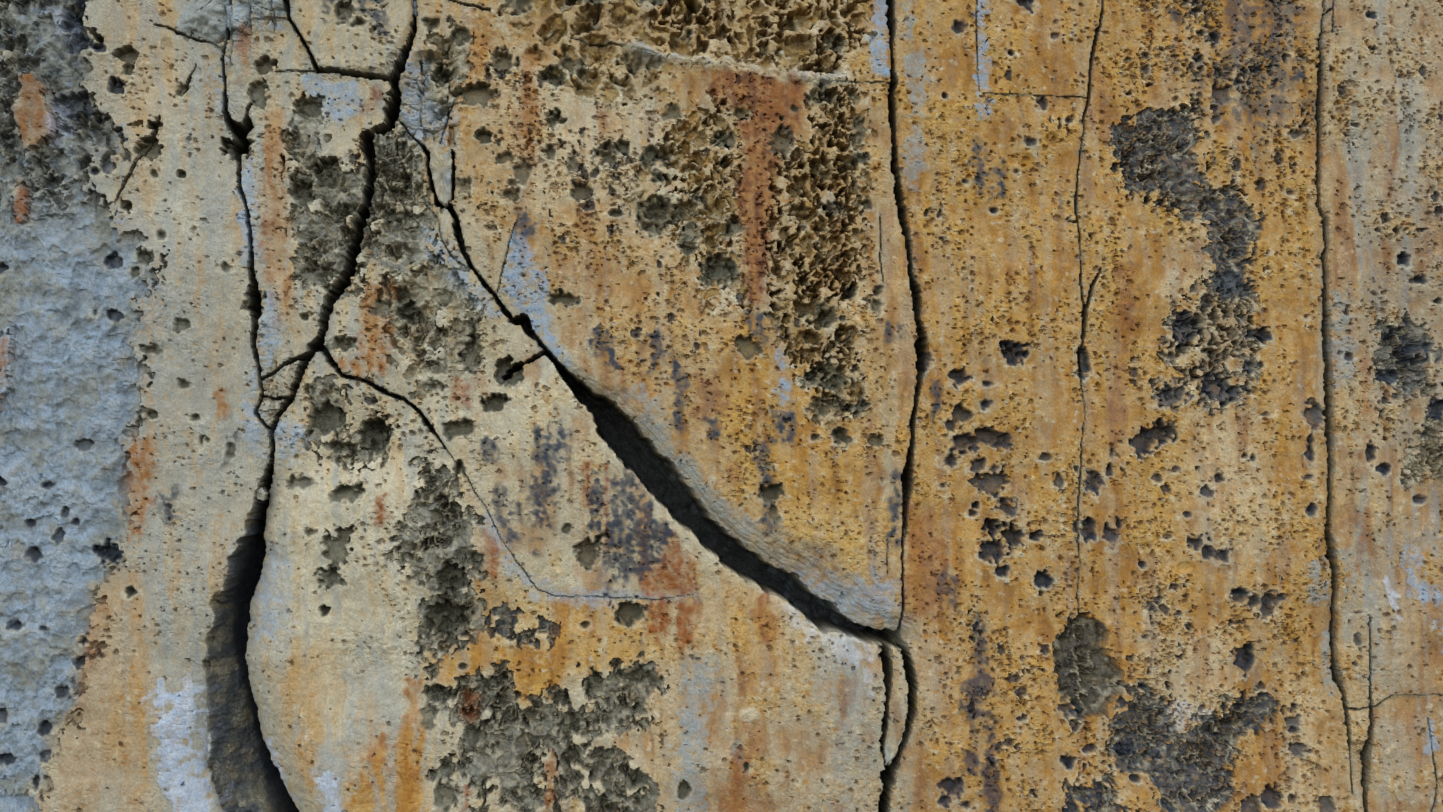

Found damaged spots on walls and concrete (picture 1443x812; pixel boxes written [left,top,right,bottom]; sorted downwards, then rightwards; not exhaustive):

spalling [0,0,195,812]
damp [136,671,236,812]
damp [265,738,298,802]
damp [312,739,357,812]
corrosion [362,673,429,812]
spalling [280,95,694,812]
crack [113,0,930,812]
spalling [419,0,887,451]
corrosion [700,67,808,309]
corrosion [888,501,968,633]
crack [975,0,1106,613]
crack [1314,0,1443,812]